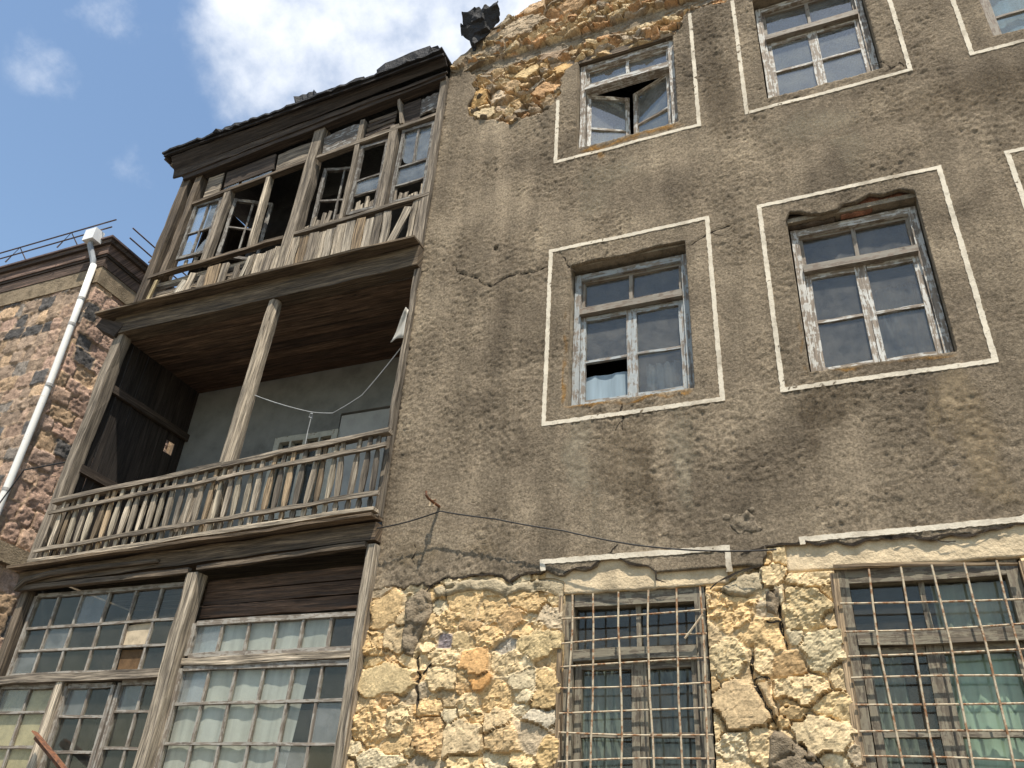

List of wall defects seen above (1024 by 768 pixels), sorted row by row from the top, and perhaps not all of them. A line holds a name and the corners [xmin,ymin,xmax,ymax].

flaking render [471,87,488,120]
flaking render [787,192,908,232]
crack [452,253,574,295]
flaking render [433,578,565,598]
crack [766,606,788,649]
crack [415,656,432,717]
crack [750,654,778,729]